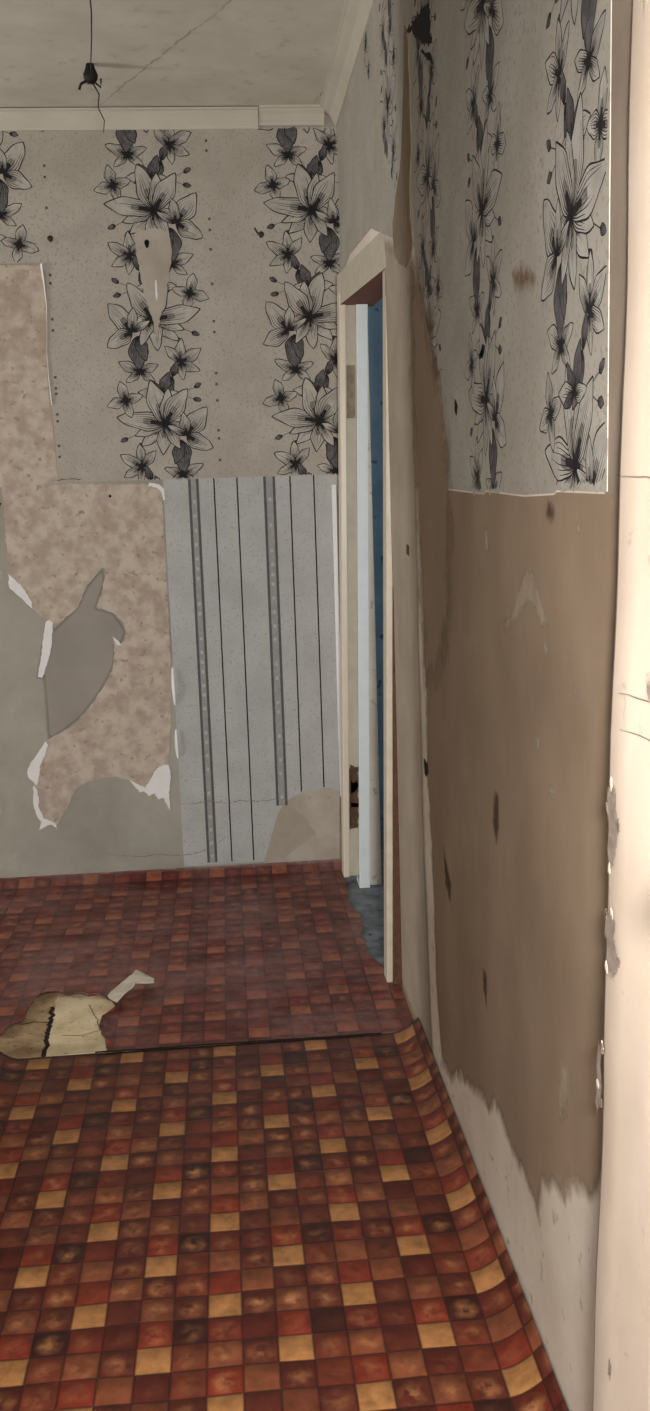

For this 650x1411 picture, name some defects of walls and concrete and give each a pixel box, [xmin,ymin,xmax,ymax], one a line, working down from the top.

peeling [134,228,172,338]
peeling [0,263,178,830]
flaking render [606,777,620,874]
flaking render [604,908,621,977]
flaking render [595,1040,604,1111]